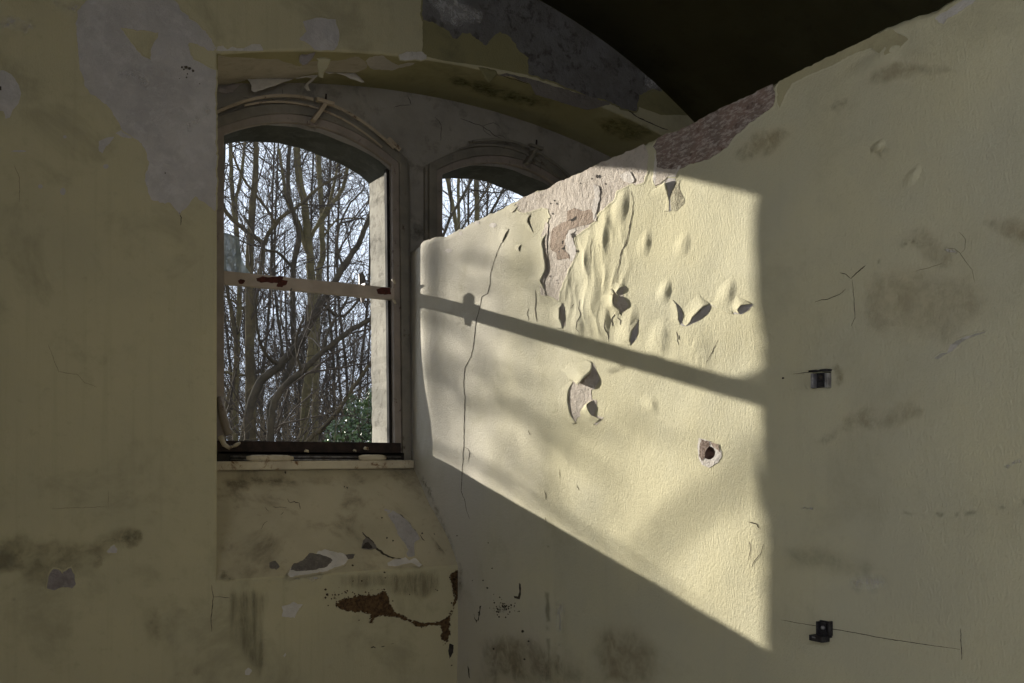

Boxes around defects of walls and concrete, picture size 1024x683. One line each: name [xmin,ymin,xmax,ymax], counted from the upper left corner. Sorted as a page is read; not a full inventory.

peeling [74,0,427,216]
peeling [420,0,663,113]
flaking render [507,29,910,329]
crack [816,266,865,326]
crack [461,228,509,519]
peeling [558,360,601,425]
spalling [699,439,710,460]
spalling [268,546,356,579]